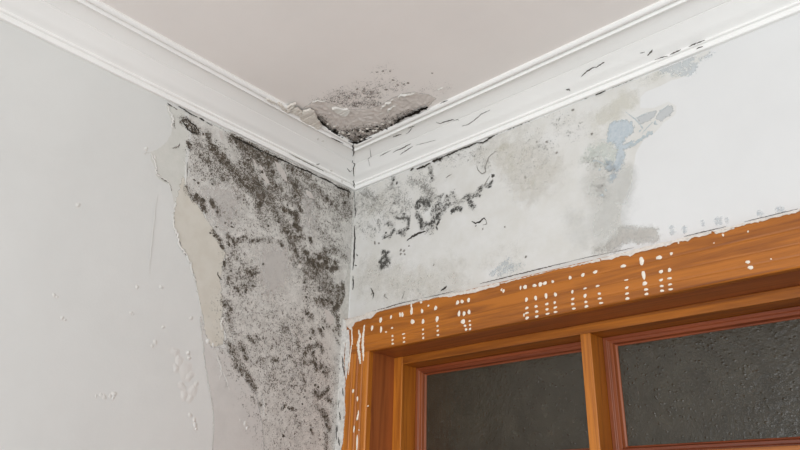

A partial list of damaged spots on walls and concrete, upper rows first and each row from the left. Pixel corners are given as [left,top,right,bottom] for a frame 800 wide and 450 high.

crack [643,40,705,60]
flaking render [266,87,448,144]
peeling [593,105,673,197]
flaking render [144,100,354,450]
crack [233,110,529,311]
water stain [174,47,719,450]
crack [480,247,634,284]